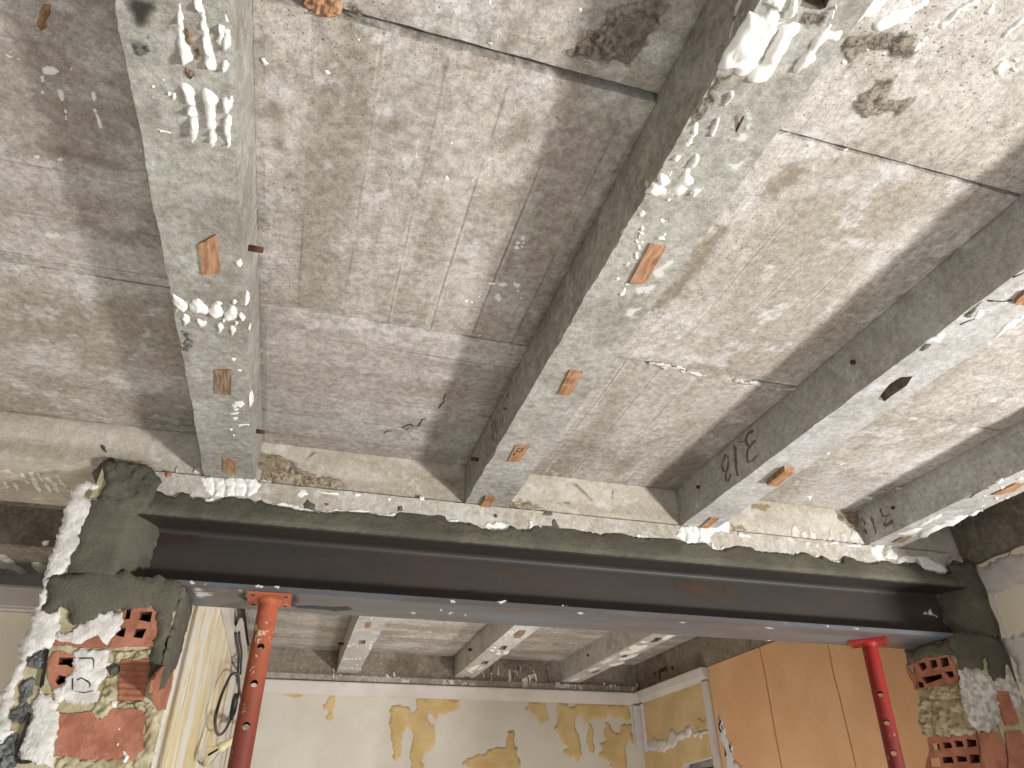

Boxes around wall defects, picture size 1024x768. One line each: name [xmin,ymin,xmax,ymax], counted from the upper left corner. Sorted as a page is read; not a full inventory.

spalling [566,0,670,64]
spalling [803,12,830,27]
spalling [840,32,919,68]
spalling [853,75,916,118]
crack [401,394,446,428]
spalling [254,453,396,516]
peeling [484,521,509,530]
spalling [509,500,543,509]
spalling [836,511,860,532]
peeling [389,698,460,768]
peeling [462,730,521,768]
peeling [525,702,635,768]